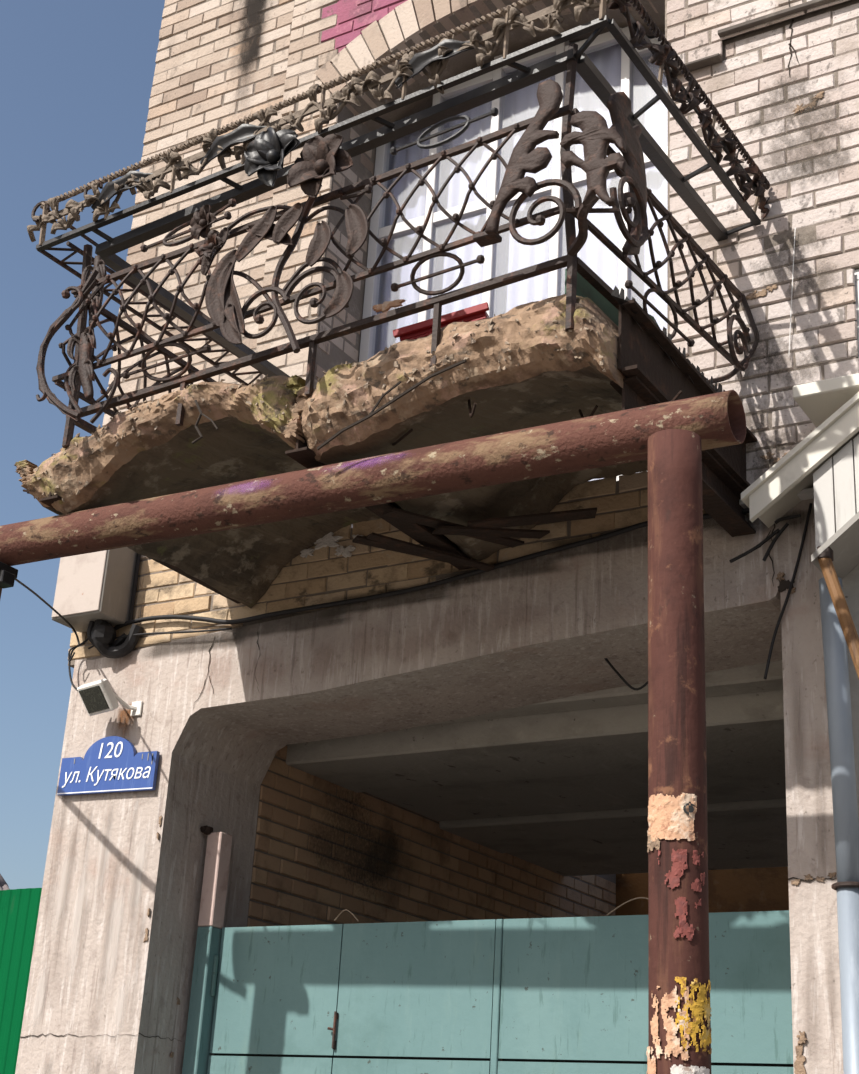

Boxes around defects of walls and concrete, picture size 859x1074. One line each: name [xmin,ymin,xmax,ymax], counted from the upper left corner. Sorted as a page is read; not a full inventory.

spalling [542,296,613,372]
spalling [307,314,502,446]
spalling [51,374,287,466]
flaking render [300,532,363,558]
crack [193,637,215,708]
crack [20,1033,179,1041]